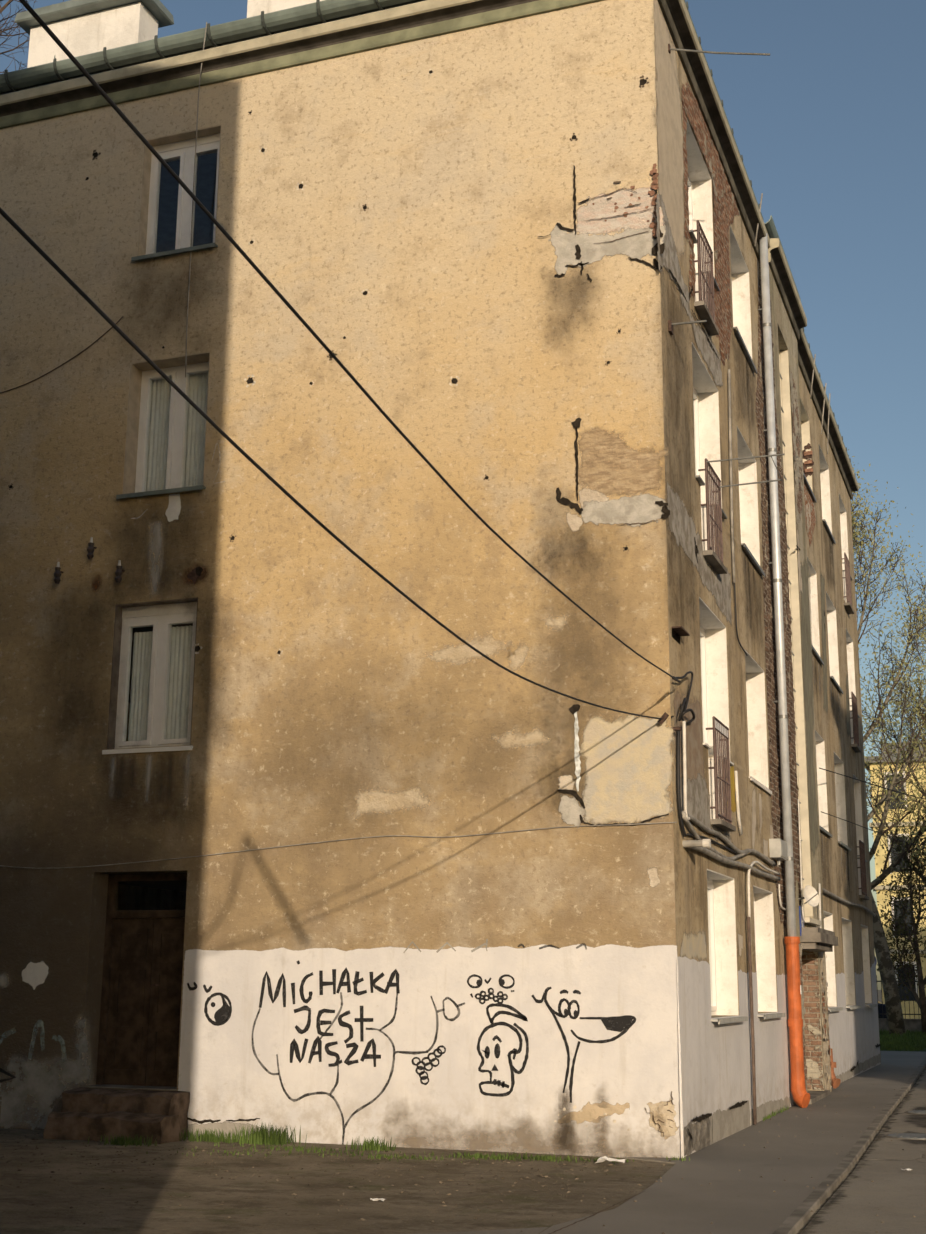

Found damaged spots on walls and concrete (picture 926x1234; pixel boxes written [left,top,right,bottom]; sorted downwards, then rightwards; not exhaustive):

flaking render [576,163,665,270]
flaking render [682,82,740,366]
crack [556,418,583,514]
flaking render [566,428,670,531]
flaking render [752,265,833,1091]
flaking render [558,715,673,828]
peeling [554,1101,630,1131]
flaking render [645,1091,678,1139]